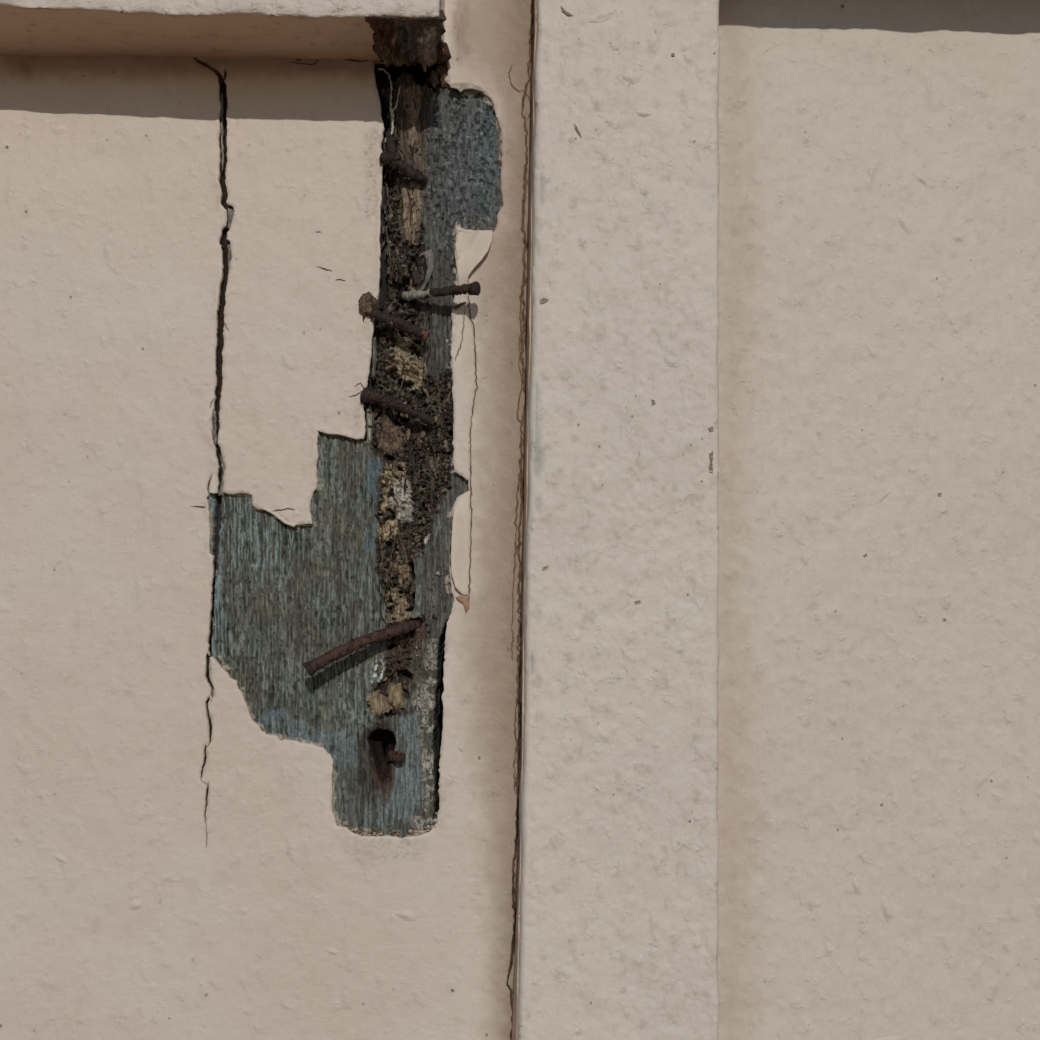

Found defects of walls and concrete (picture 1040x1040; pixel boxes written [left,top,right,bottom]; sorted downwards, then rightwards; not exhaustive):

crack [192,61,234,508]
peeling [208,61,503,837]
crack [200,653,214,847]